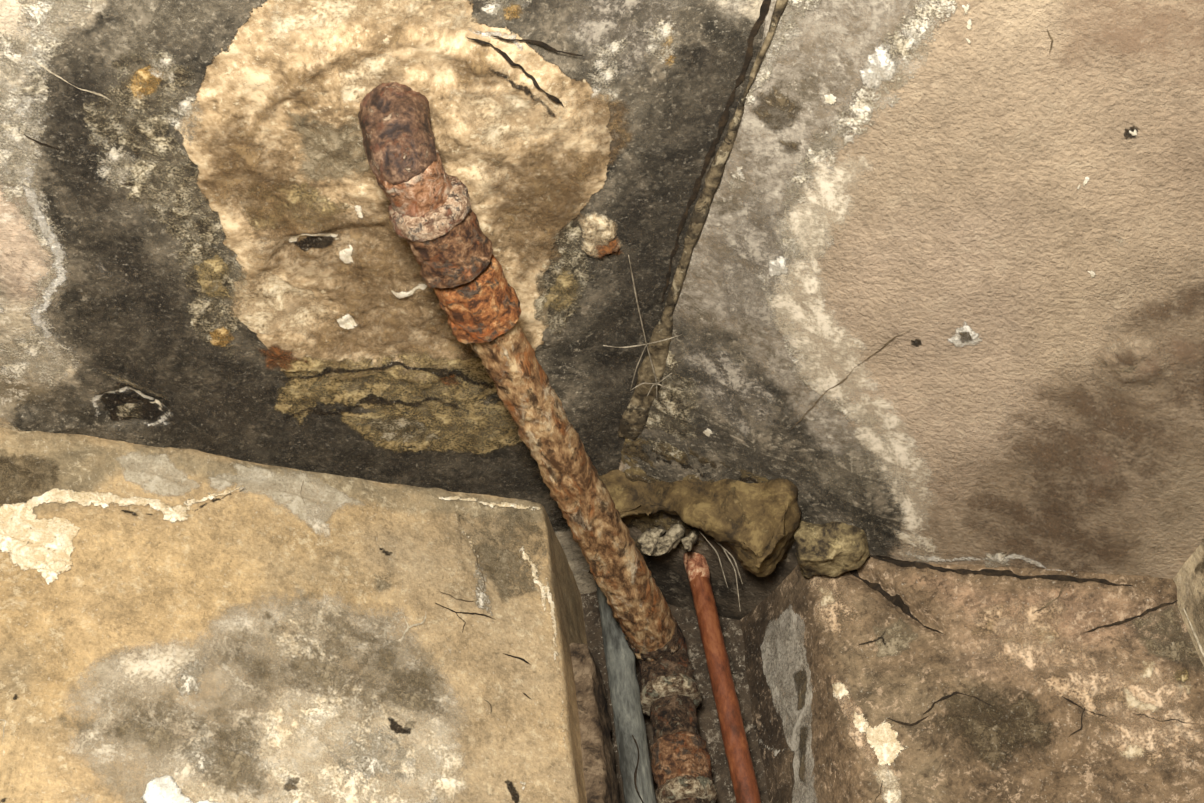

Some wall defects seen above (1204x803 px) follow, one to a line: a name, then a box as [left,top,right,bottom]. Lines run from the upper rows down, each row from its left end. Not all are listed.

damp [0,0,570,536]
spalling [79,0,629,454]
crack [467,35,584,107]
crack [661,0,771,304]
damp [468,0,972,556]
crack [795,325,918,425]
peeling [0,485,245,585]
damp [59,593,466,803]
crack [850,555,1178,646]
damp [970,392,1158,571]